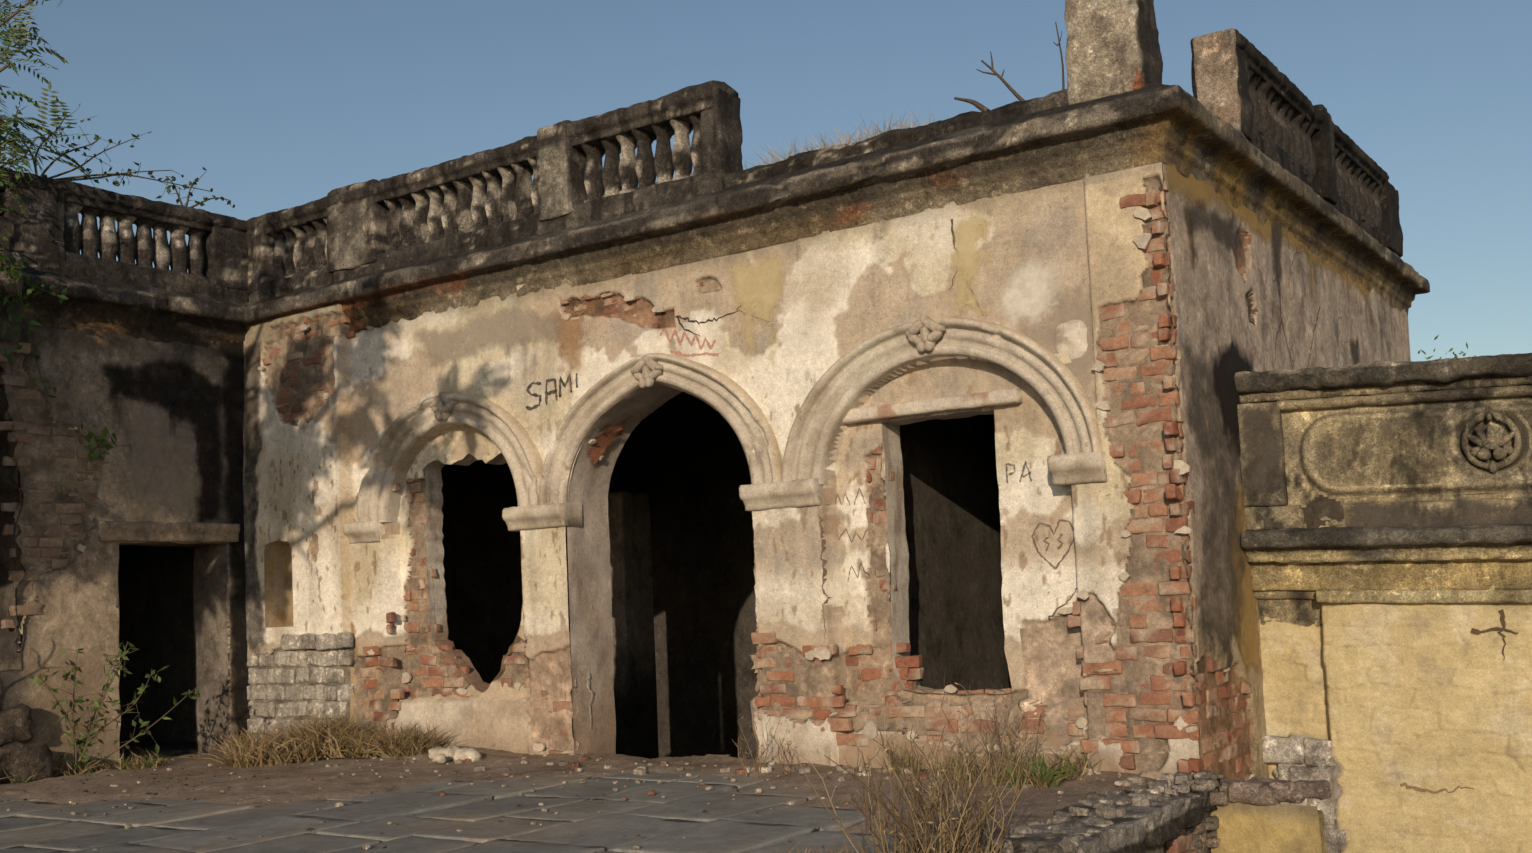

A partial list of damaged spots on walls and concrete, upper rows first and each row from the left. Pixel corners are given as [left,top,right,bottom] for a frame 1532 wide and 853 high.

leakage [1167,163,1369,298]
spalling [258,311,416,430]
spalling [560,292,676,329]
leakage [1351,339,1359,365]
leakage [104,339,265,744]
spalling [751,176,1347,853]
spalling [247,478,474,743]
crack [1471,609,1518,659]